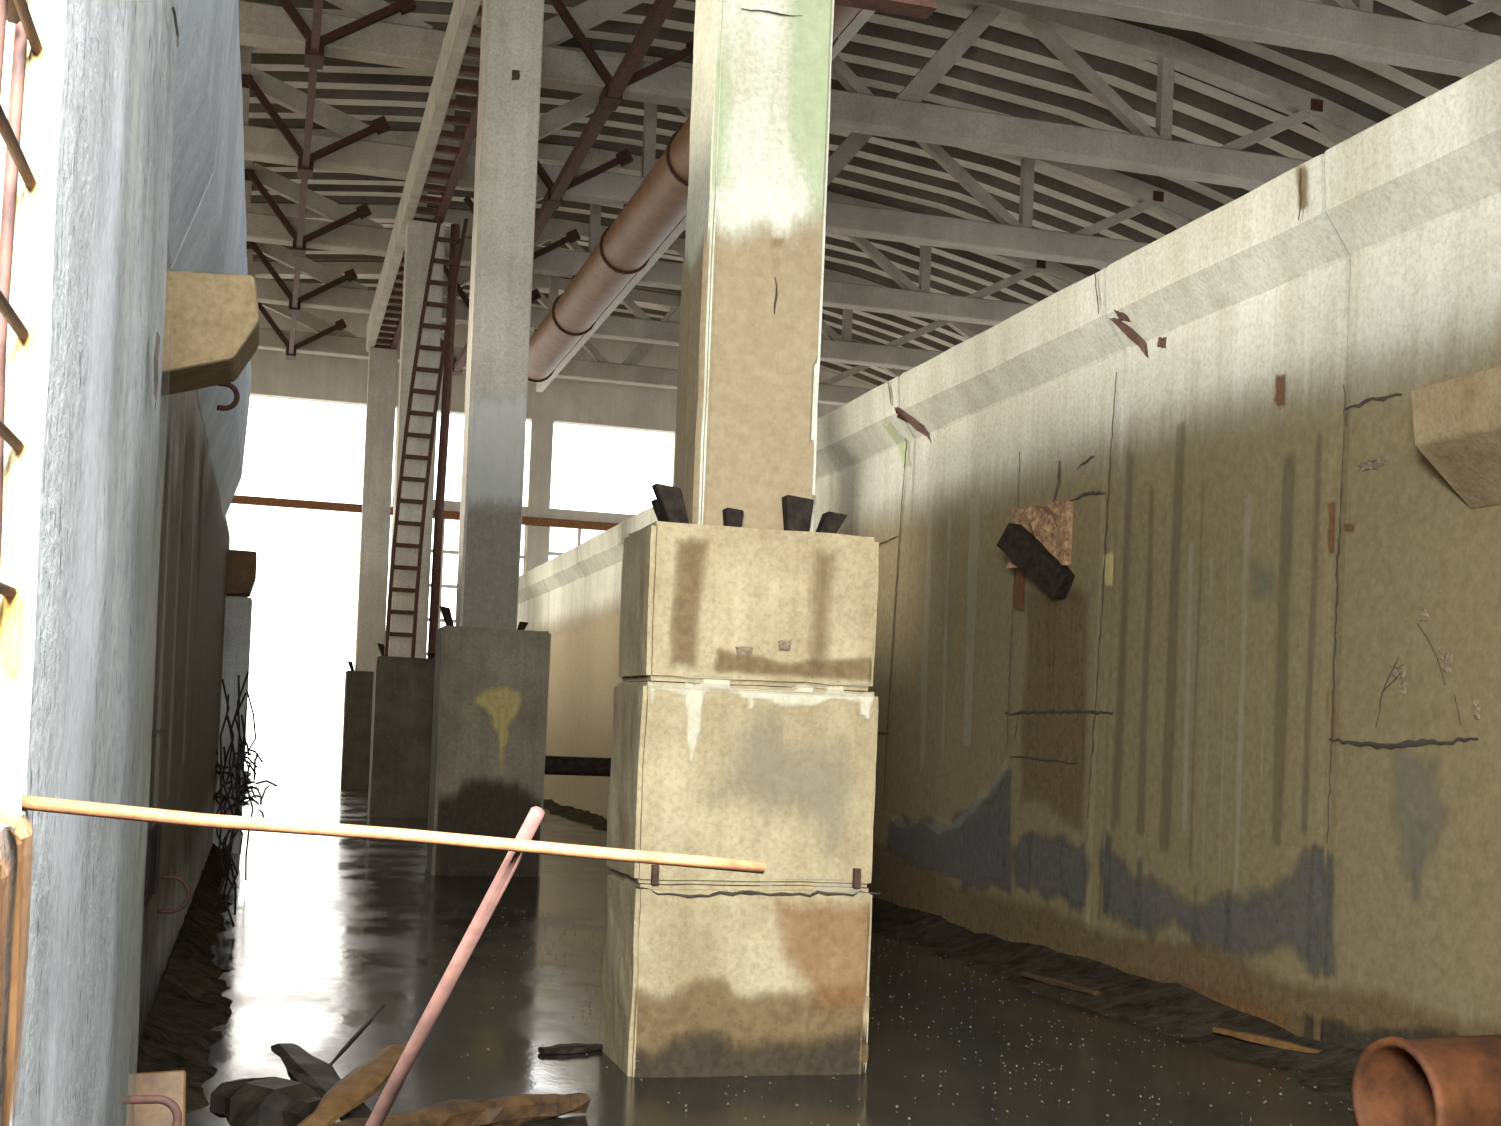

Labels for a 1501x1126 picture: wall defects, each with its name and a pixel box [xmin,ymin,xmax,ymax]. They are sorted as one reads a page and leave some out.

leakage [475,687,521,763]
leakage [545,606,623,758]
leakage [650,348,1501,1051]
leakage [435,775,610,877]
crack [635,886,881,898]
leakage [631,982,869,1078]